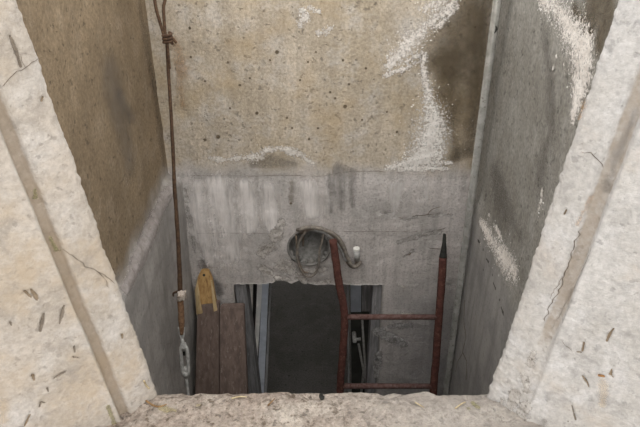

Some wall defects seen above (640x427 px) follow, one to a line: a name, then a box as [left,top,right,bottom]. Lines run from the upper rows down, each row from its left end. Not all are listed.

damp [382,0,486,173]
damp [537,0,613,125]
damp [188,175,278,266]
damp [208,145,315,166]
damp [300,179,319,218]
damp [479,214,520,285]
crack [544,230,591,325]